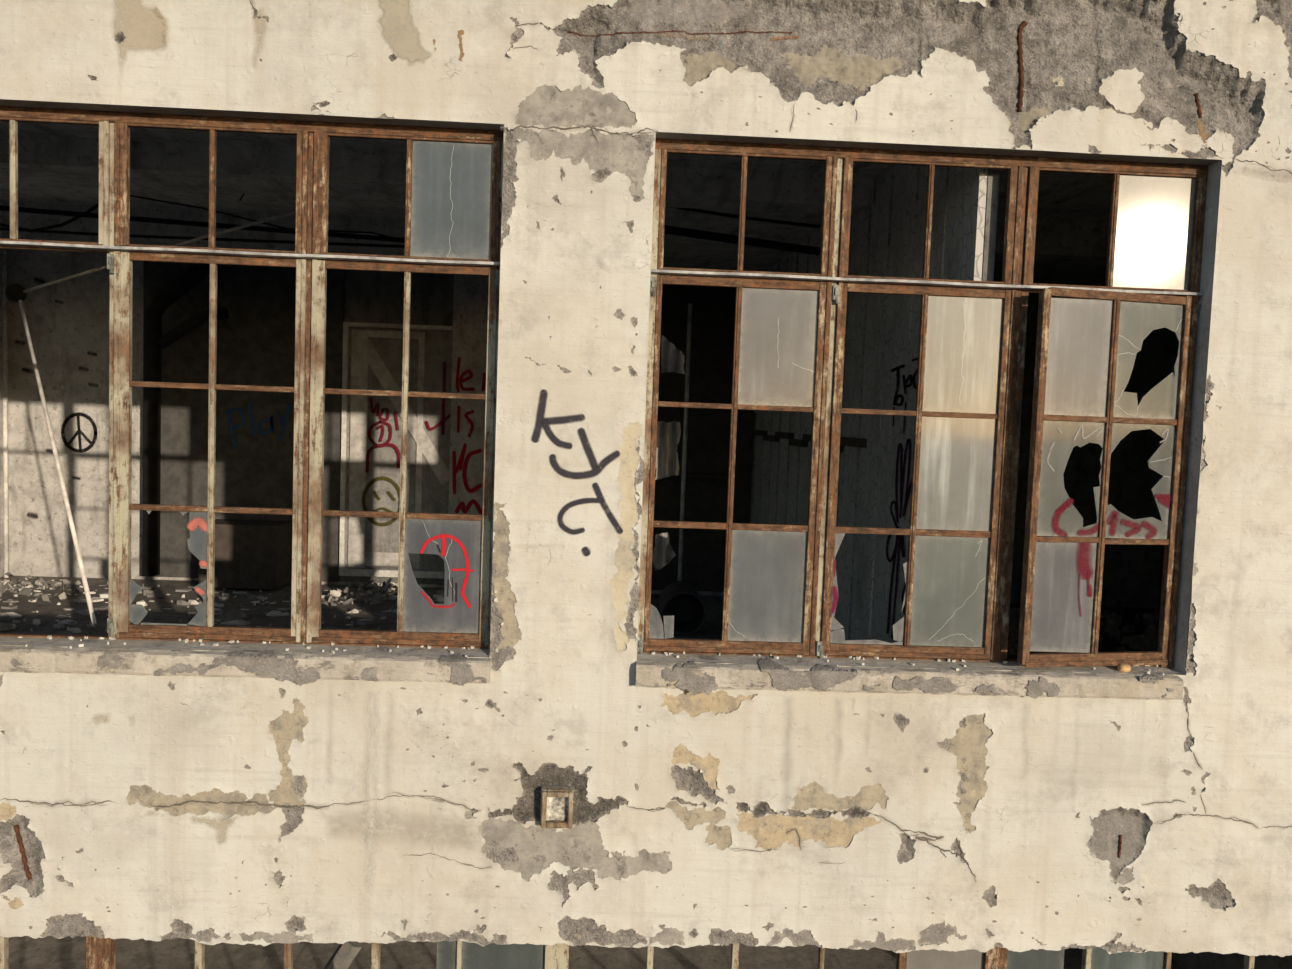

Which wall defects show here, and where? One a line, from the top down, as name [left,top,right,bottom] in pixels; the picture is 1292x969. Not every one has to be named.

spalling [501,0,1292,248]
crack [2,798,115,807]
crack [148,795,472,810]
peeling [670,765,880,819]
crack [1147,703,1292,828]
spalling [0,814,83,899]
flaking render [424,751,822,947]
spalling [1075,806,1153,921]
peeling [29,911,105,939]
peeling [380,907,507,946]
flaking render [847,887,967,953]
peeling [982,885,1003,948]